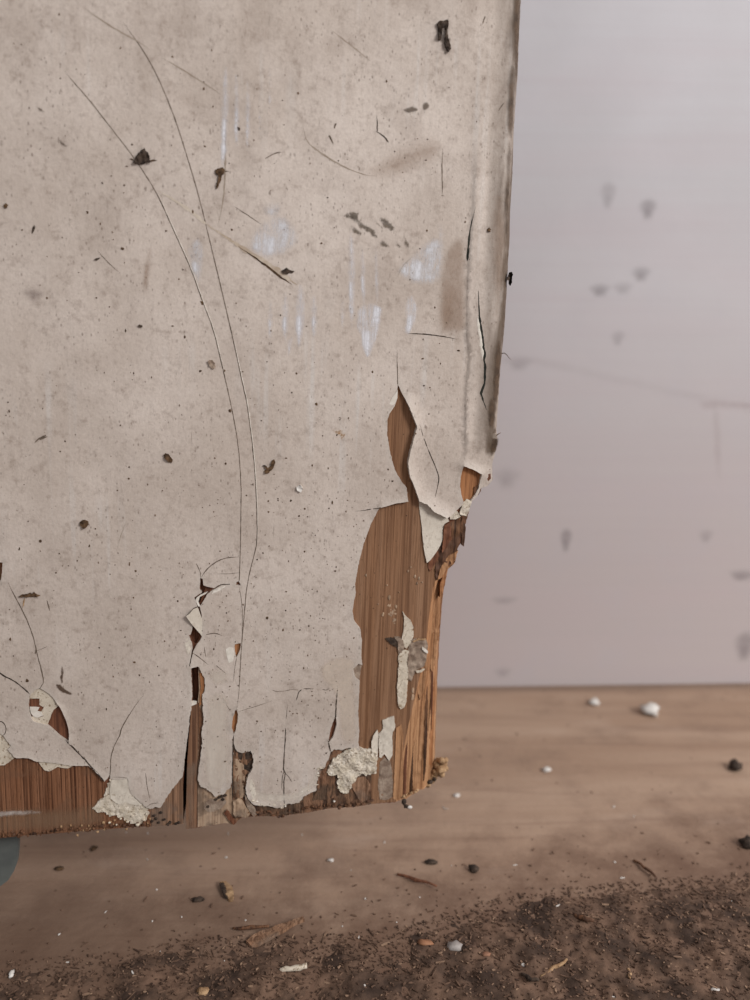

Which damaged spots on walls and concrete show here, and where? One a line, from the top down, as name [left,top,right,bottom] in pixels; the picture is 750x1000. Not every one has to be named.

crack [477,291,487,410]
crack [66,24,338,808]
peeling [185,580,240,654]
peeling [226,643,241,663]
peeling [233,386,491,821]
peeling [29,688,69,740]
peeling [0,734,151,838]